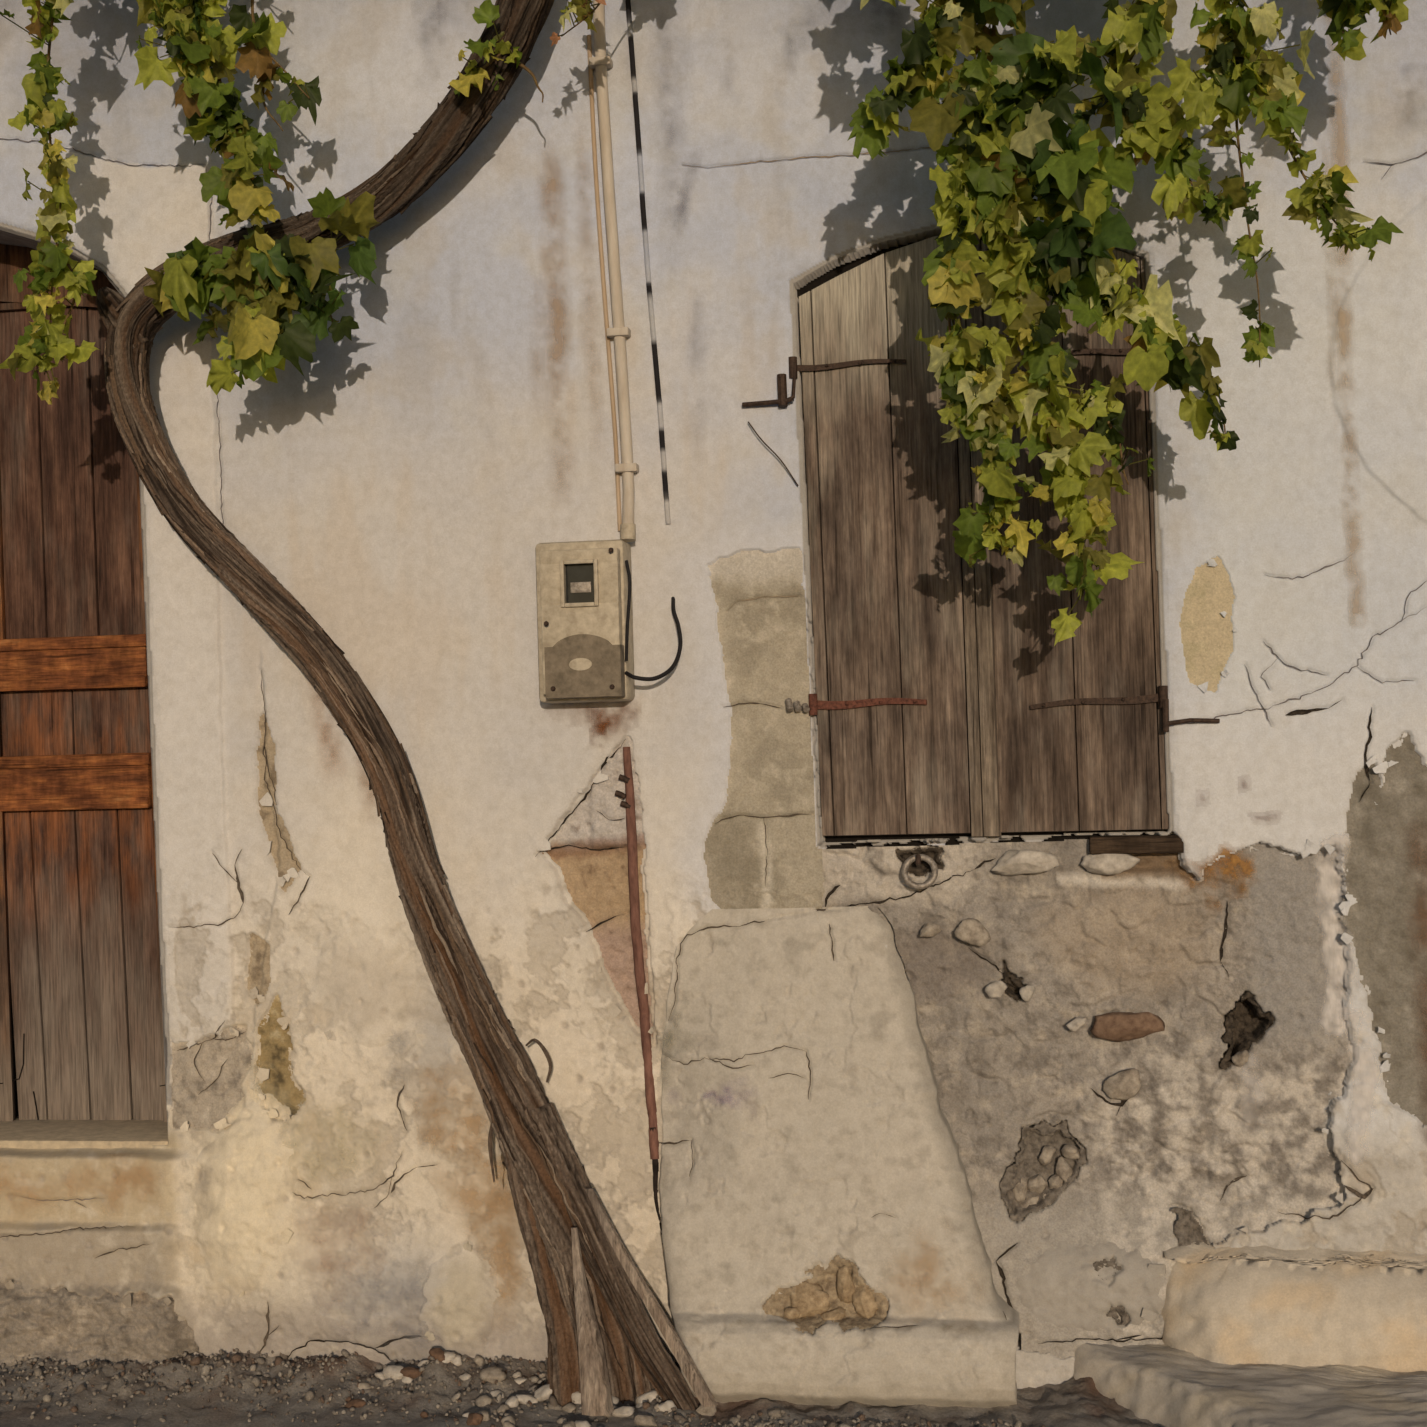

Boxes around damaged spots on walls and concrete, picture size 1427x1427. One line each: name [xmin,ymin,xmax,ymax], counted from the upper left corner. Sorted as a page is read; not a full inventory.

crack [685,145,949,168]
corrosion [596,714,619,732]
crack [1188,581,1426,801]
flaking render [256,713,301,892]
flaking render [535,737,655,1037]
corrosion [1191,848,1254,890]
flaking render [171,933,306,1132]
crack [668,921,764,1021]
crack [667,1045,811,1100]
flaking render [704,548,1427,1360]
crack [294,1084,435,1207]
crack [0,1195,149,1258]